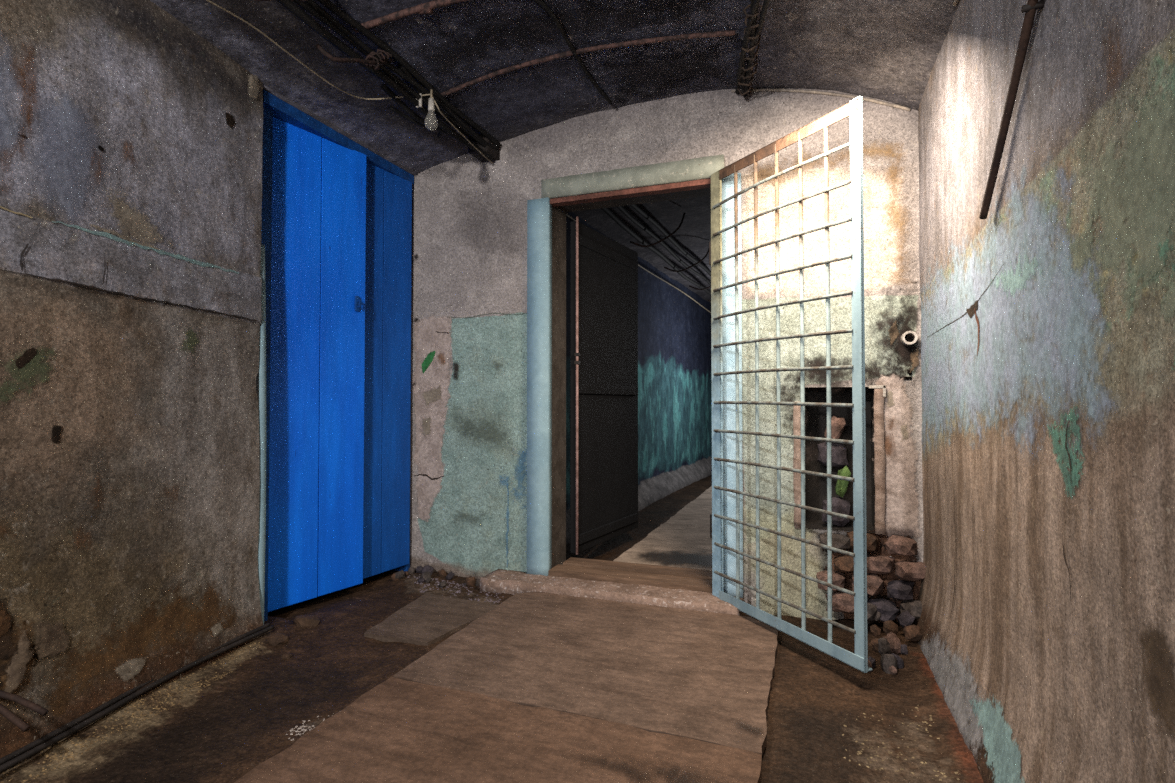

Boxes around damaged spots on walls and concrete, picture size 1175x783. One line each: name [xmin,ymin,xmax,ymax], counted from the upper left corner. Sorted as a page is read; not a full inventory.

flaking render [412,313,527,522]
peeling [825,92,1175,623]
spalling [0,598,69,702]